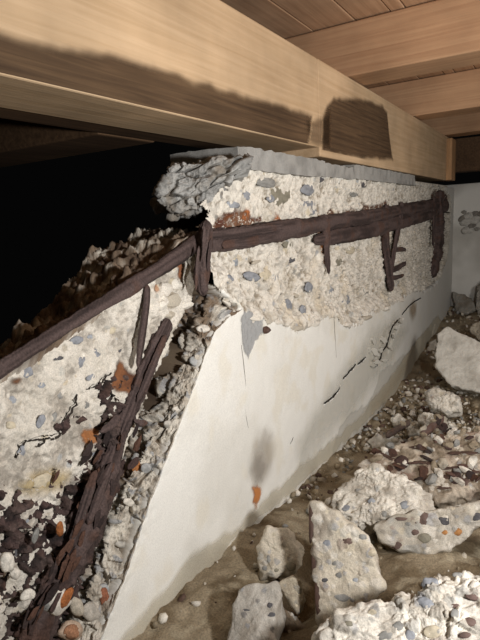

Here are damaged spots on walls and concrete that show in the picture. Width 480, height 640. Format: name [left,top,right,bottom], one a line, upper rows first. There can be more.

damp [0,35,311,144]
damp [323,99,393,159]
corrosion [213,208,261,229]
crack [14,372,112,458]
corrosion [79,429,110,467]
corrosion [112,362,135,393]
corrosion [116,423,142,473]
spalling [0,153,480,640]
damp [125,317,441,640]
crack [324,298,421,404]
corrosion [27,510,104,635]
corrosion [100,587,109,604]